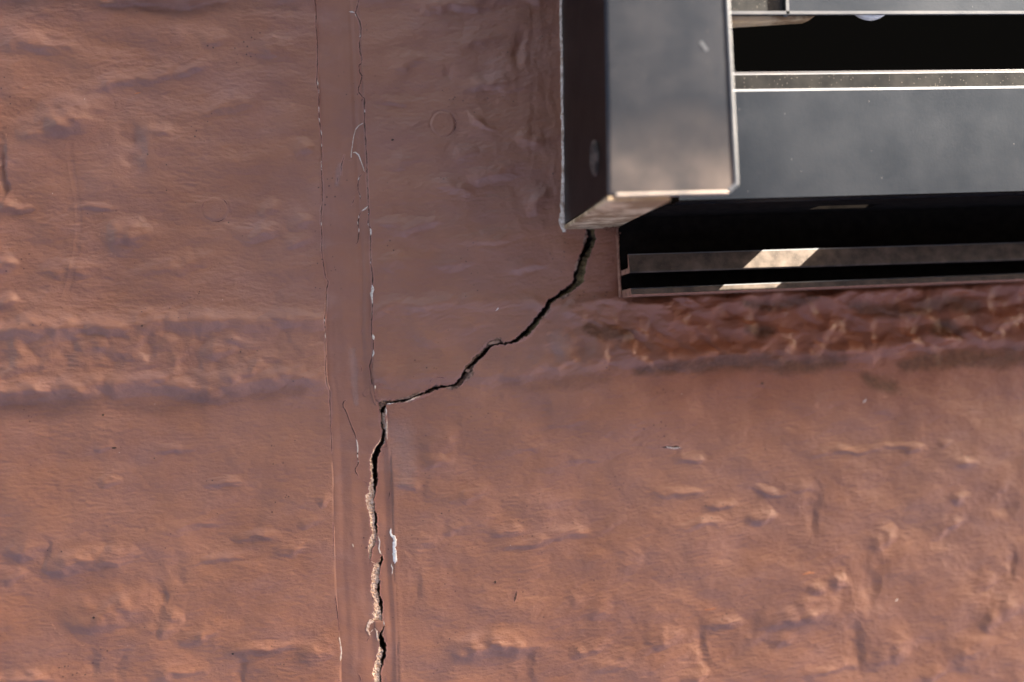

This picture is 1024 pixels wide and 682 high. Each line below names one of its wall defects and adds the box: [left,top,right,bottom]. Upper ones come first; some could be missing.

crack [313,0,598,682]